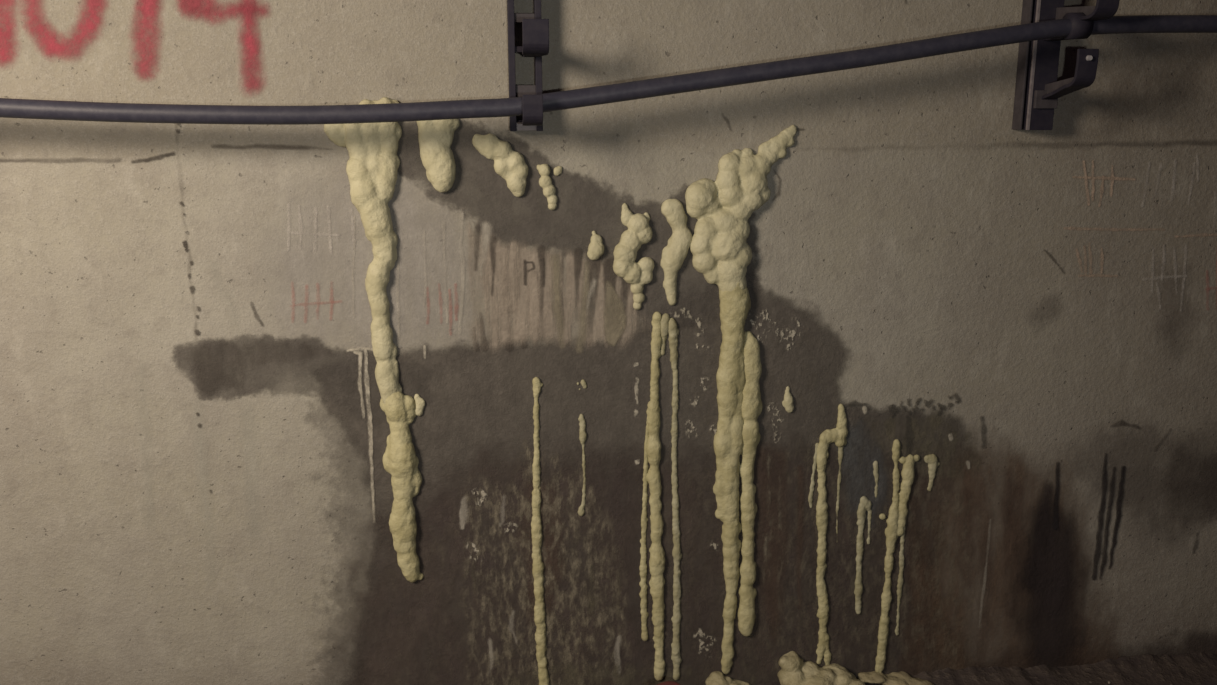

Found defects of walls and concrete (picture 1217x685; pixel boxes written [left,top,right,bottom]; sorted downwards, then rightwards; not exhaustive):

water stain [174,122,1076,685]
water stain [1092,455,1125,580]